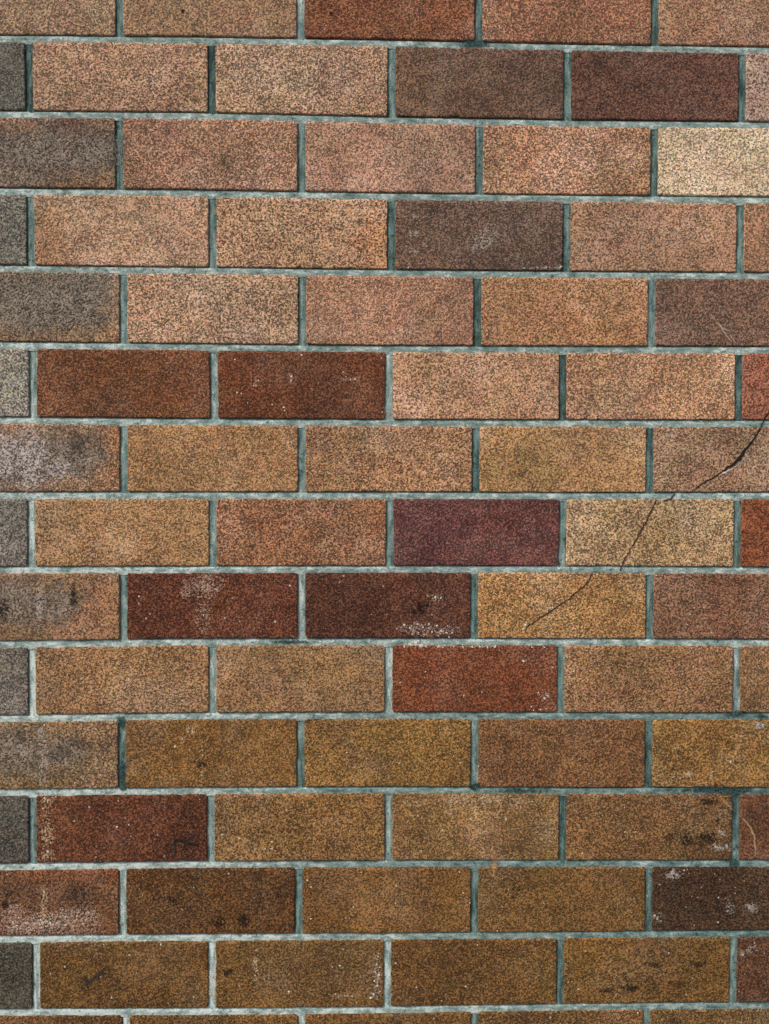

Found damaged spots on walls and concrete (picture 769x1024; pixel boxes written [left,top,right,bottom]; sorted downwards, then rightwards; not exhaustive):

crack [620,412,769,571]
crack [523,573,593,630]